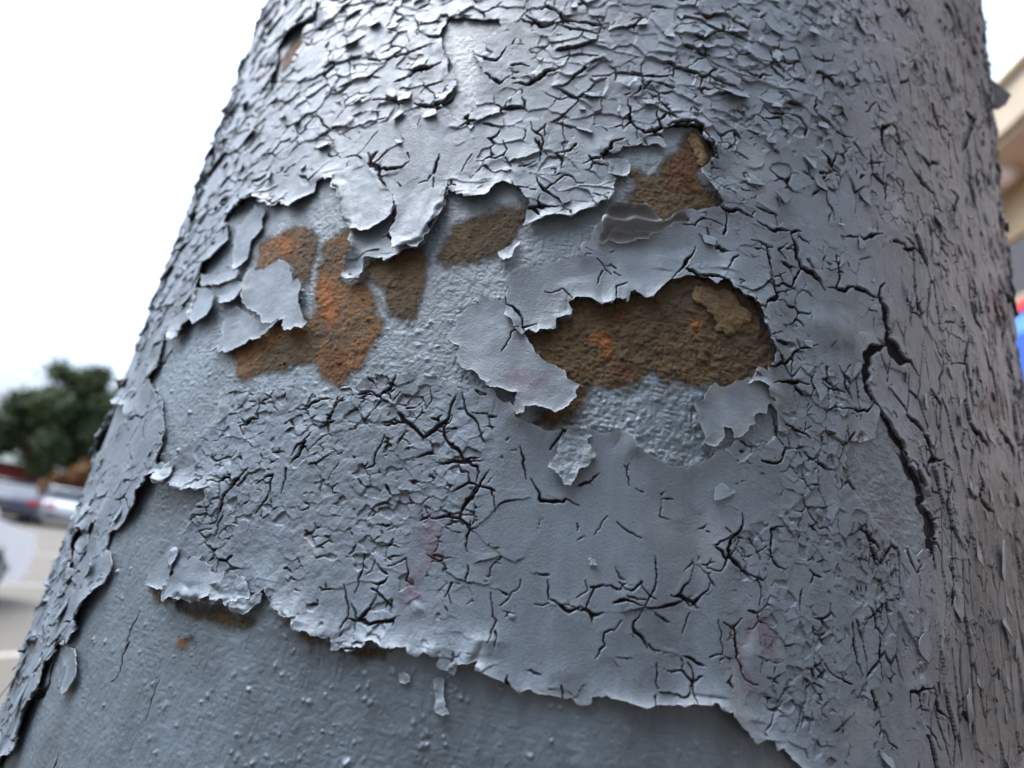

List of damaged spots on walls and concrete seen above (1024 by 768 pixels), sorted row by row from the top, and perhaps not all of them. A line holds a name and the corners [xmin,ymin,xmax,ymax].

peeling [219,2,321,116]
crack [368,153,410,240]
peeling [391,91,412,121]
crack [369,47,456,109]
peeling [422,17,501,129]
crack [463,81,745,205]
rust [625,130,721,220]
rust [232,204,528,388]
rust [527,275,775,427]
peeling [0,123,802,768]
peeling [840,410,936,565]
crack [598,513,784,703]